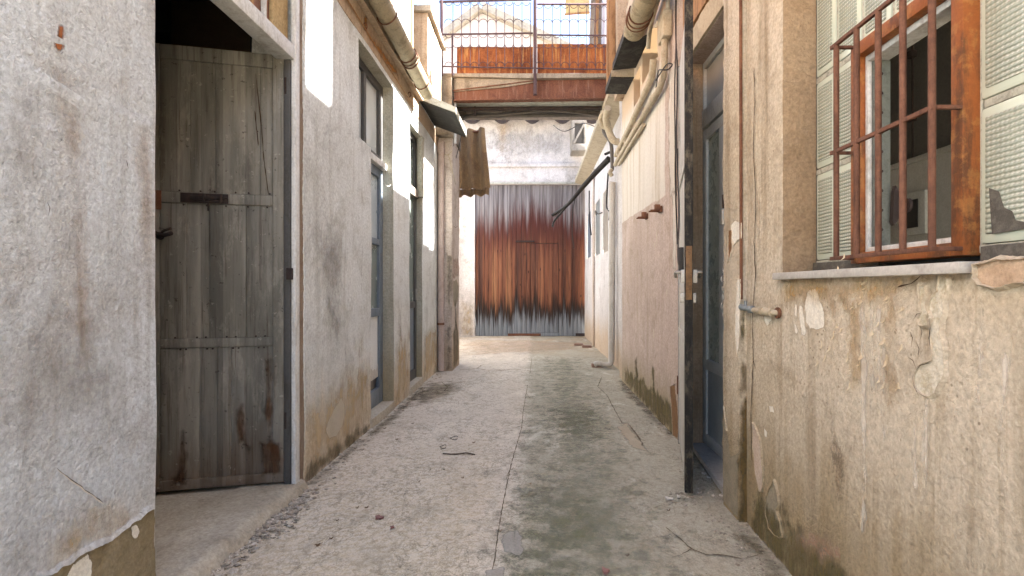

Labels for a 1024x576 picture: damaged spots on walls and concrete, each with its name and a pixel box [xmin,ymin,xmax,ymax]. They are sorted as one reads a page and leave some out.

crack [749,77,757,405]
spalling [971,255,1024,292]
peeling [794,289,824,336]
spalling [913,274,953,399]
corrosion [237,408,281,474]
damp [306,351,456,483]
damp [620,358,672,434]
peeling [751,422,785,539]
spalling [19,504,156,576]